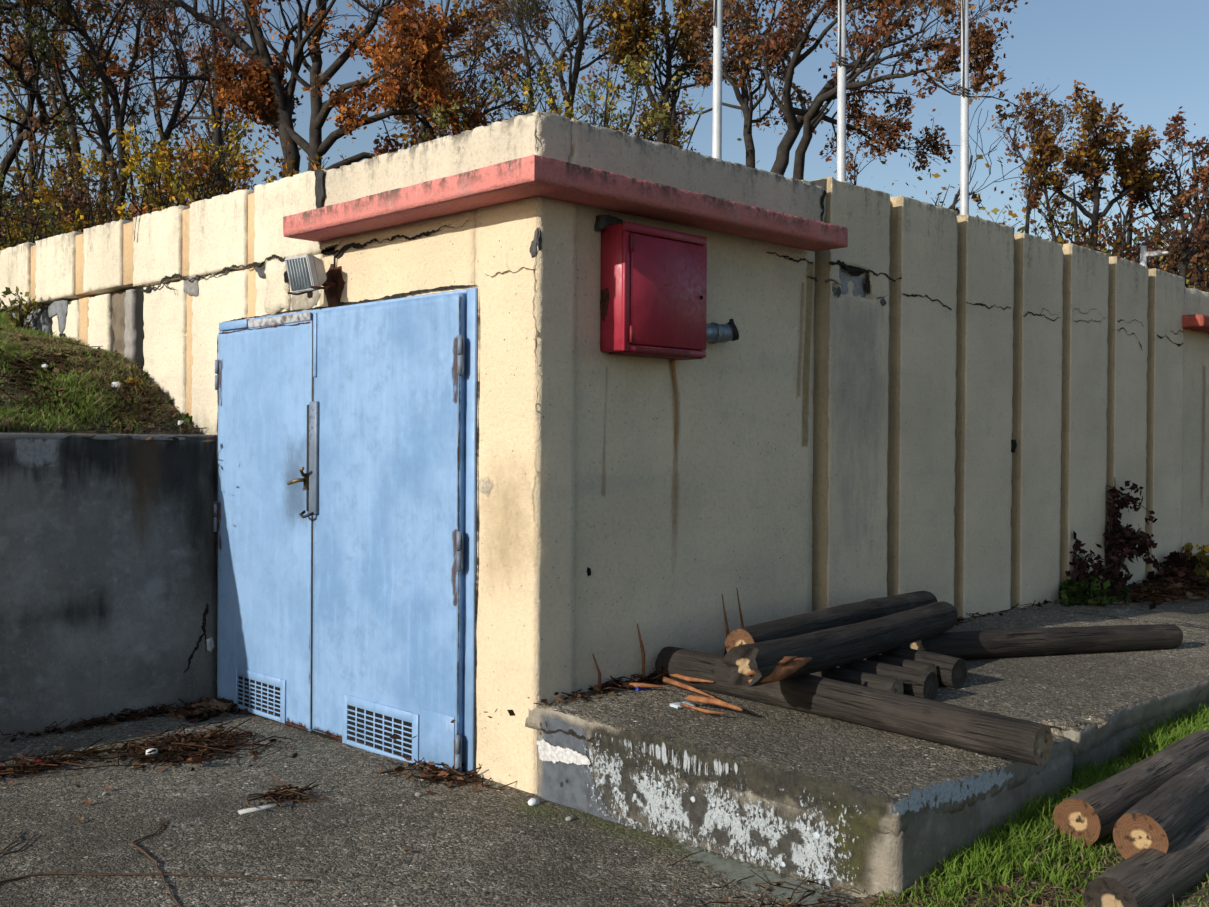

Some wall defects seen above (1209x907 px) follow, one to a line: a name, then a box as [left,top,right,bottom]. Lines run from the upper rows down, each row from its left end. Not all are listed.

crack [321,220,468,258]
crack [140,254,286,295]
spalling [832,265,886,306]
crack [767,252,1184,348]
water stain [0,428,218,539]
crack [184,604,209,673]
peeling [536,716,861,889]